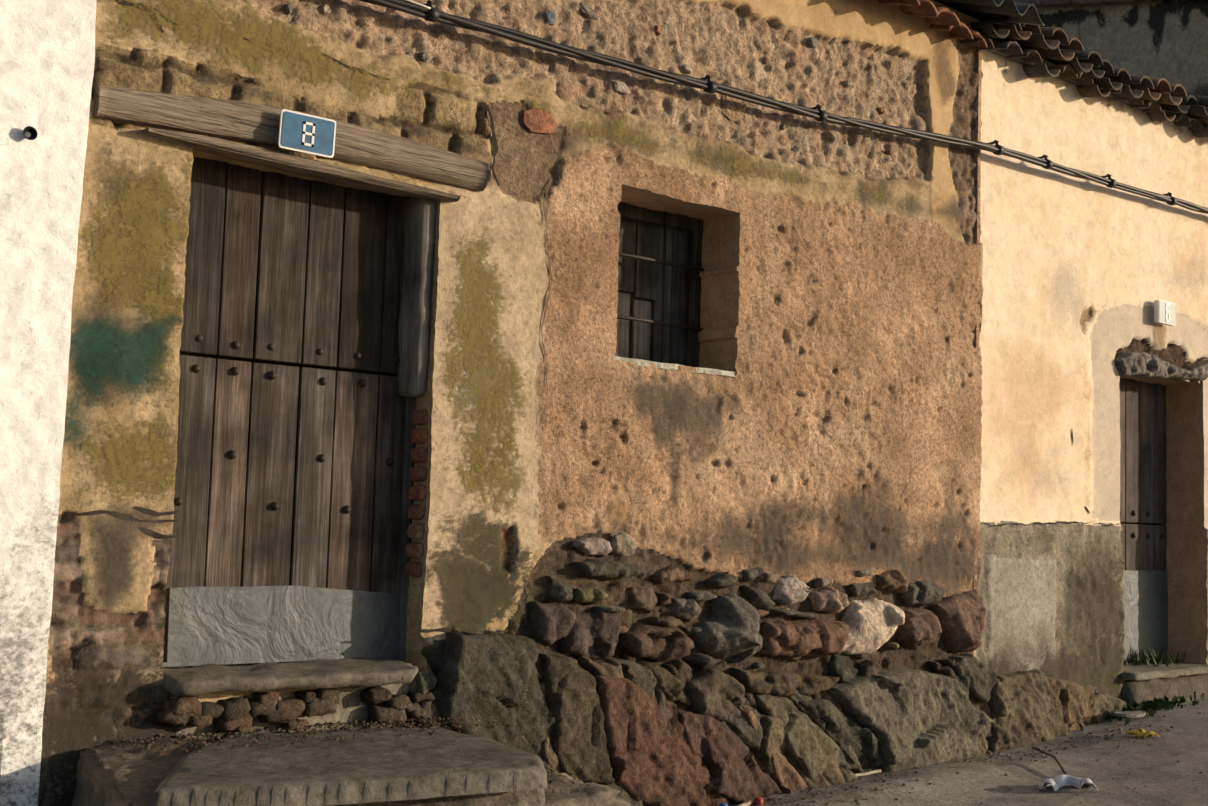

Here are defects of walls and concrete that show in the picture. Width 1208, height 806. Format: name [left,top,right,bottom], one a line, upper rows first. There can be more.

damp [1038,8,1105,29]
damp [1123,0,1208,51]
spalling [91,43,567,203]
spalling [243,0,931,181]
spalling [948,39,983,246]
spalling [1115,326,1208,382]
damp [636,377,738,499]
spalling [0,511,175,754]
damp [425,510,541,634]
spalling [528,532,987,669]
damp [689,485,975,596]